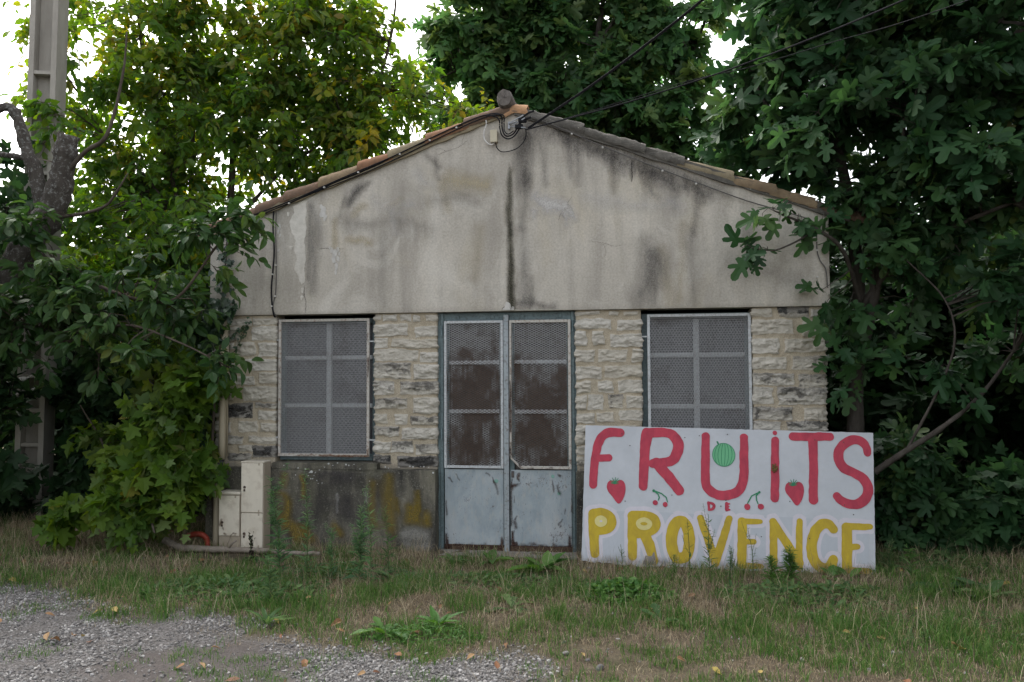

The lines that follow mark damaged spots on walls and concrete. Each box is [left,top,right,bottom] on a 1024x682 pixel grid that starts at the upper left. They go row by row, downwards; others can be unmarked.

flaking render [277,200,327,300]